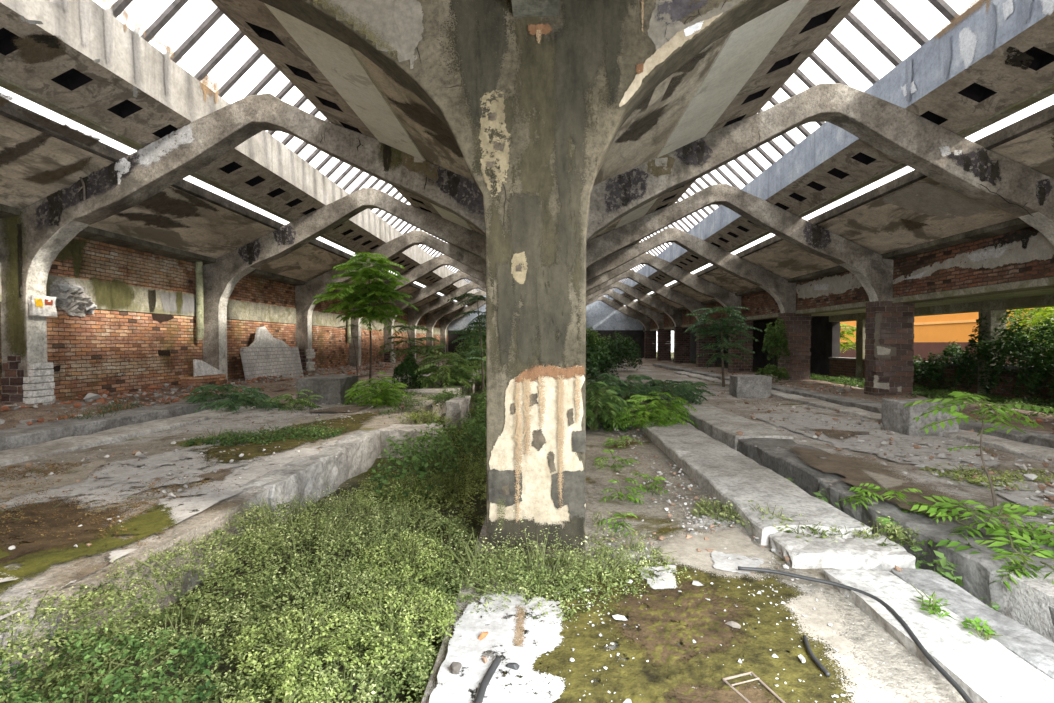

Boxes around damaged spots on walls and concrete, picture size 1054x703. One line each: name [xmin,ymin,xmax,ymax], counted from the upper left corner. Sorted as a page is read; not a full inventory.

spalling [619,0,743,107]
water stain [0,217,23,377]
flaking render [479,90,511,197]
flaking render [511,252,528,284]
water stain [385,0,713,388]
flaking render [893,232,1054,284]
spalling [488,365,587,547]
corrosion [513,364,585,522]